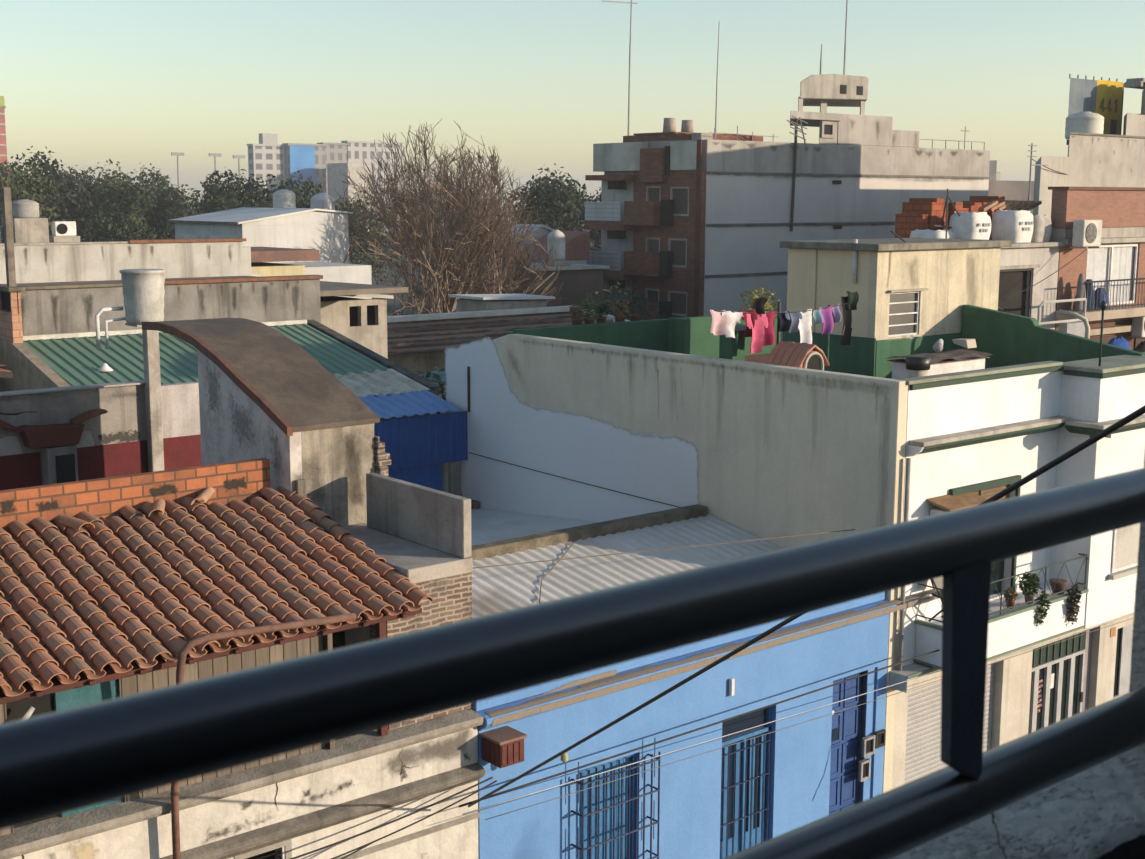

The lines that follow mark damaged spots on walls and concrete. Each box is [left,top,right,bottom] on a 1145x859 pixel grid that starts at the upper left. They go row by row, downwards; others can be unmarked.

leakage [389,730,469,779]
crack [991,813,1007,859]